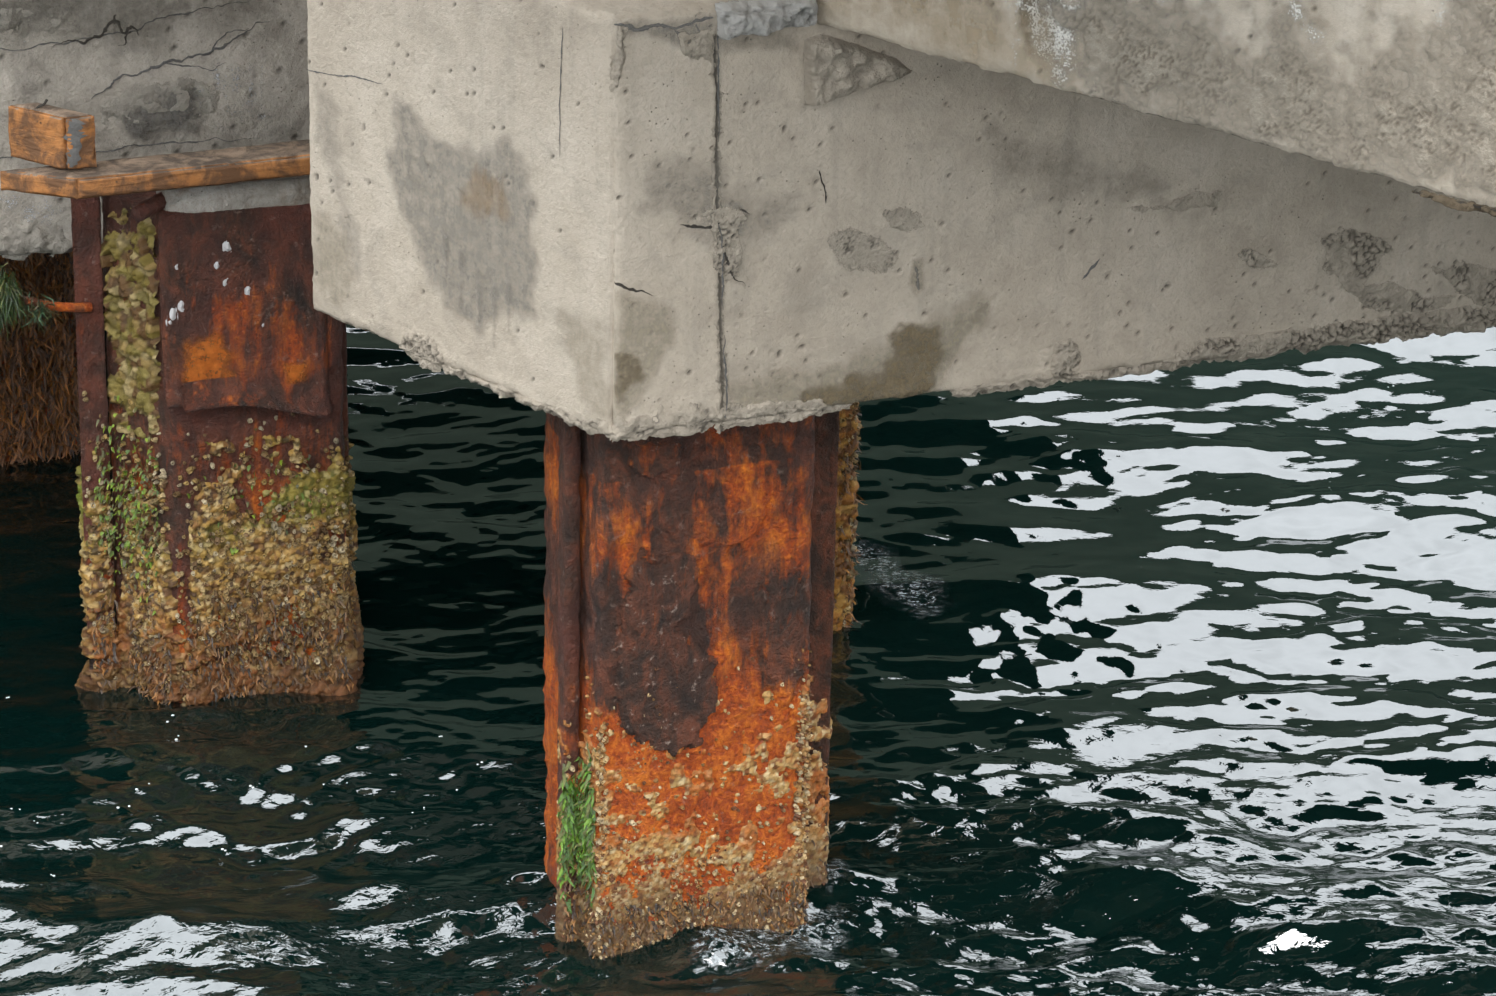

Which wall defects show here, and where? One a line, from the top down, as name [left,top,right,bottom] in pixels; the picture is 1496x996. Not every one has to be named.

crack [0,1,270,99]
spalling [803,33,912,106]
damp [894,0,1086,89]
damp [1288,1,1325,47]
spalling [1411,190,1496,217]
spalling [950,229,1496,397]